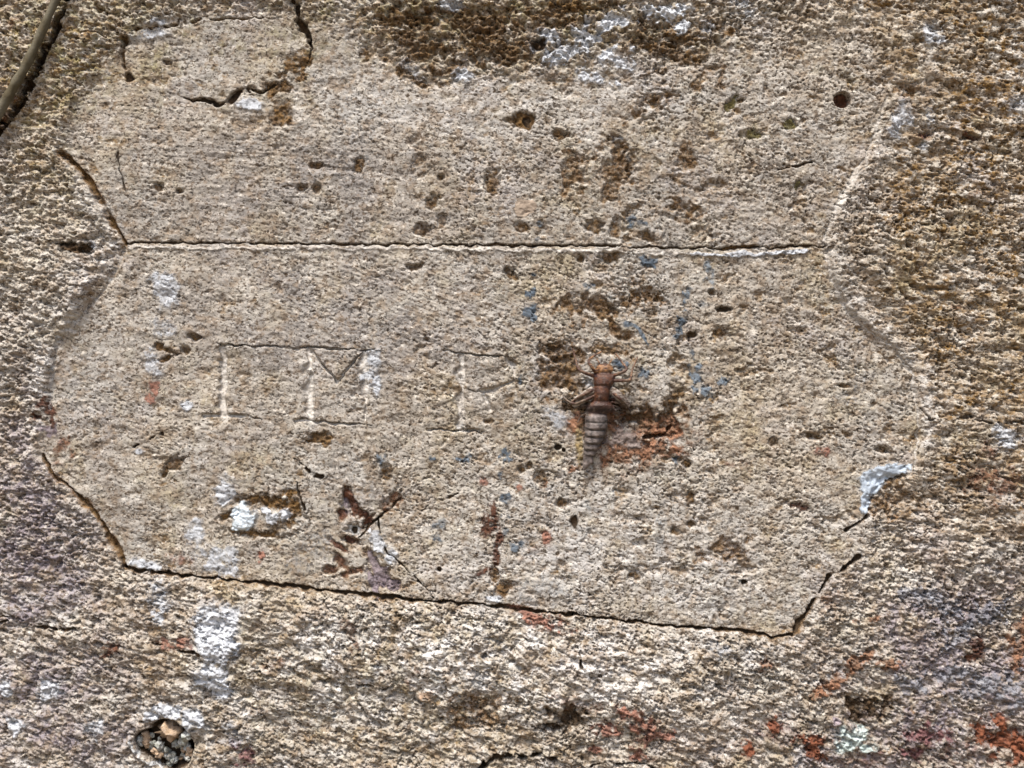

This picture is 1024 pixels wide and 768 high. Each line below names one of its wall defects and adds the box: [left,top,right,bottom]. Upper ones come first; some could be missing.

crack [0,0,276,136]
crack [291,0,313,62]
crack [294,458,324,511]
crack [359,493,458,598]
crack [818,514,868,593]
spalling [137,719,195,768]